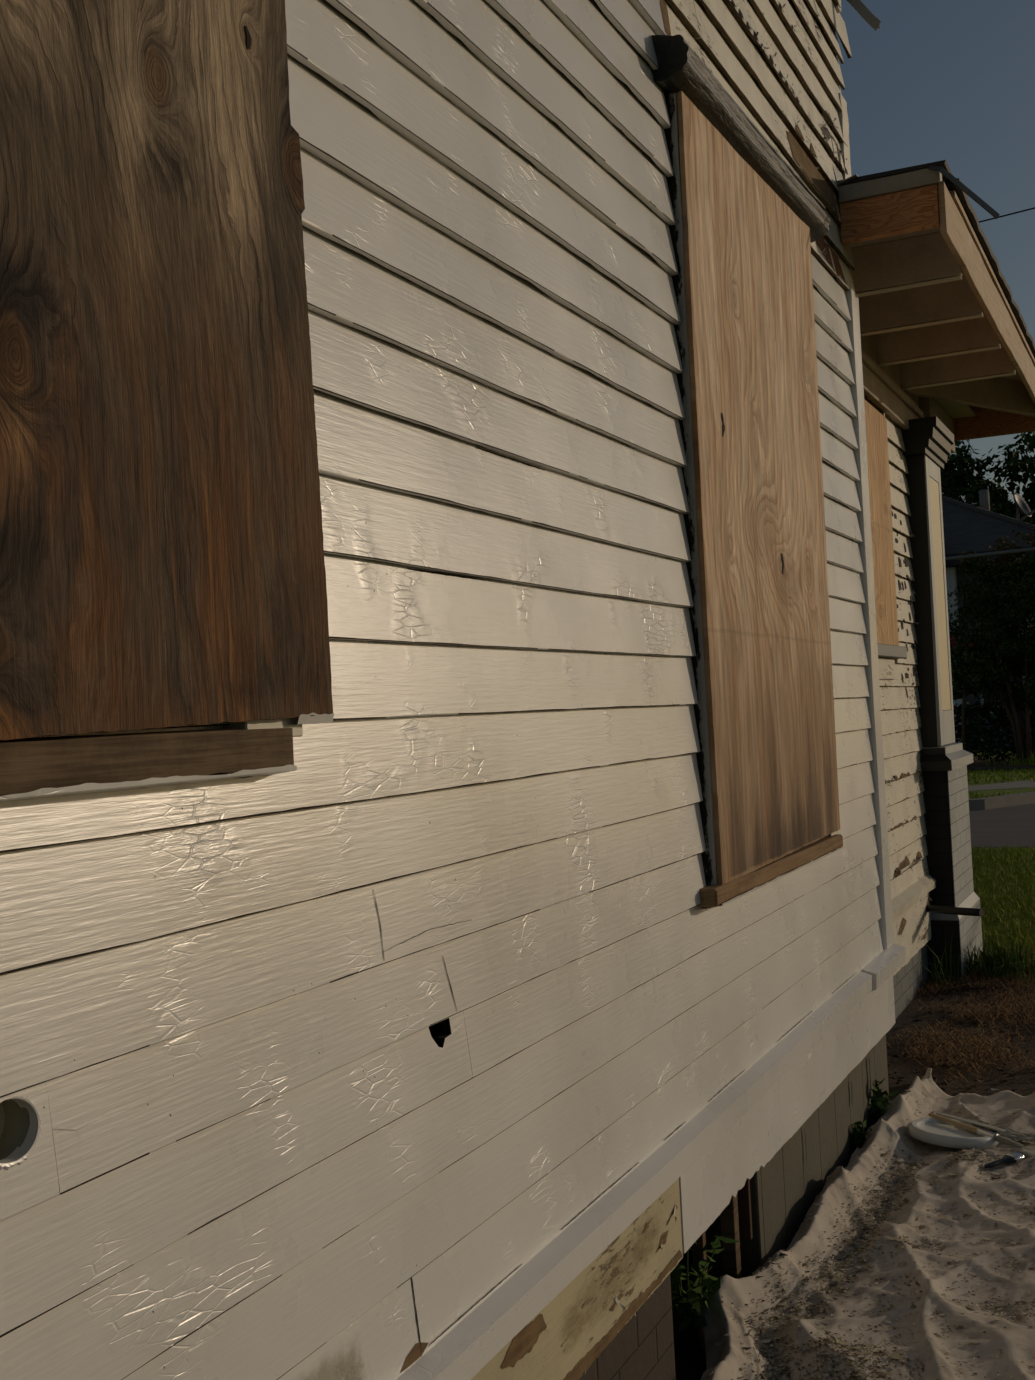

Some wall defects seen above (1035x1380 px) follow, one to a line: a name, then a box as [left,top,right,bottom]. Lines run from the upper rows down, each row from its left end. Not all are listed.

peeling [660,0,671,36]
peeling [732,0,847,218]
peeling [892,512,919,685]
peeling [885,765,921,786]
peeling [894,851,924,879]
crack [373,889,470,1009]
crack [664,1072,742,1141]
crack [561,1162,639,1230]
crack [411,1264,522,1347]
peeling [564,1204,683,1380]
peeling [501,1314,549,1368]